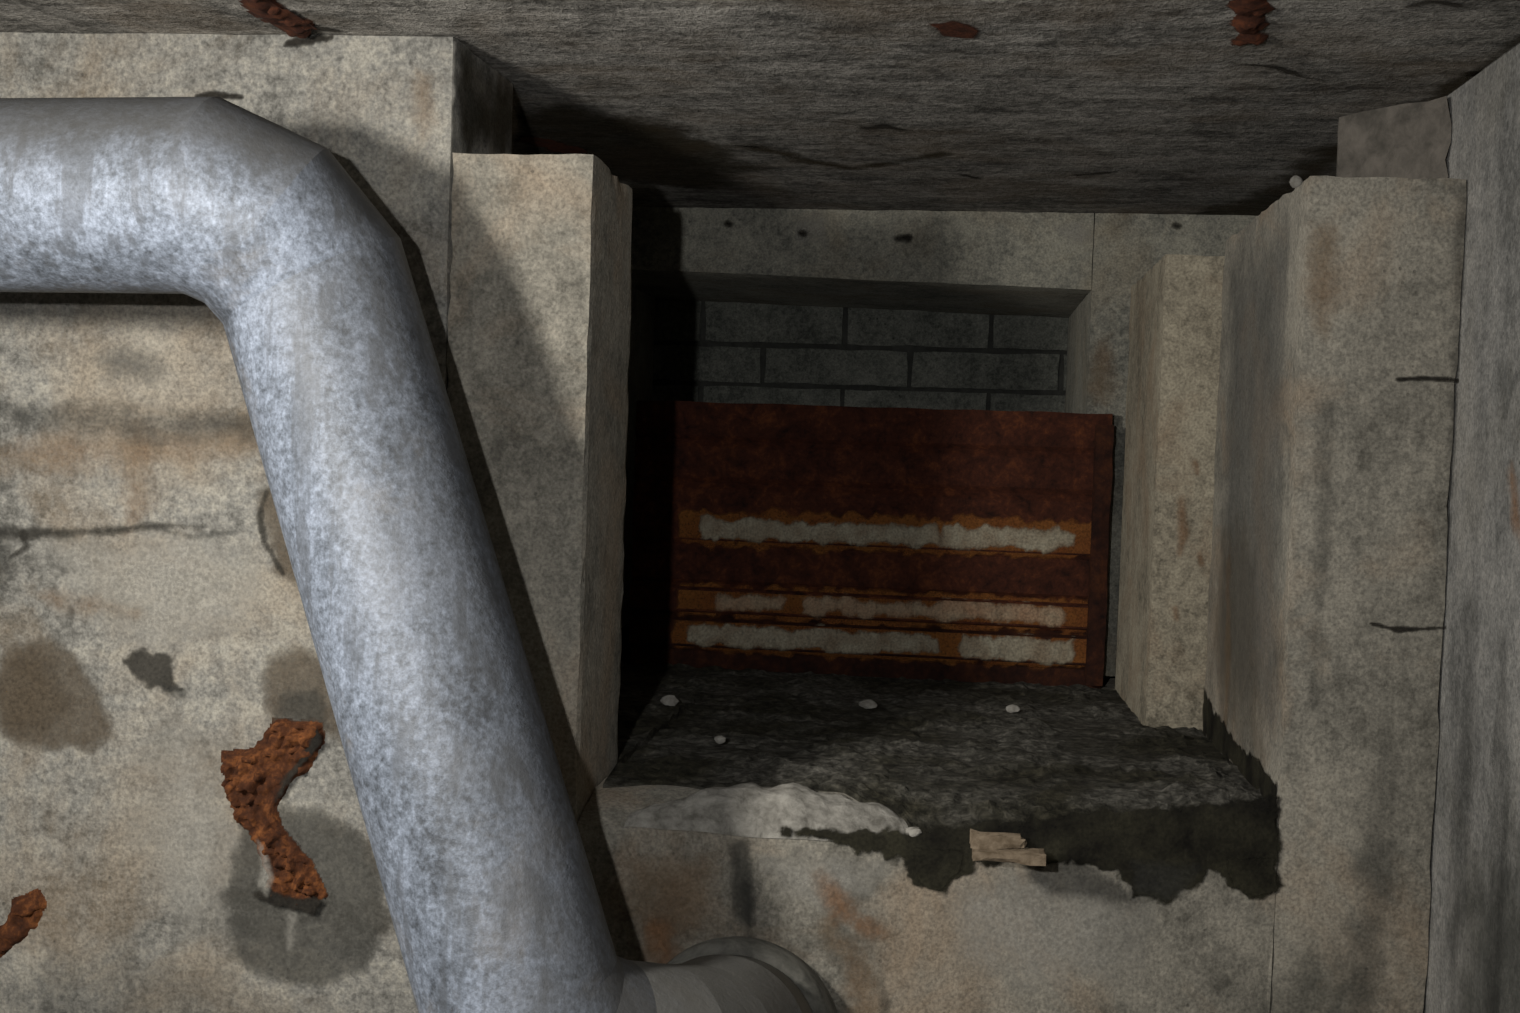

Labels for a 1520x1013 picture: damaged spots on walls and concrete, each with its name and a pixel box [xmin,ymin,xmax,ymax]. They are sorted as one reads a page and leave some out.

rust [930,21,978,38]
crack [0,524,164,555]
rust [678,508,1091,559]
rust [671,582,1088,668]
water stain [0,643,108,748]
water stain [124,649,182,691]
water stain [229,813,384,980]